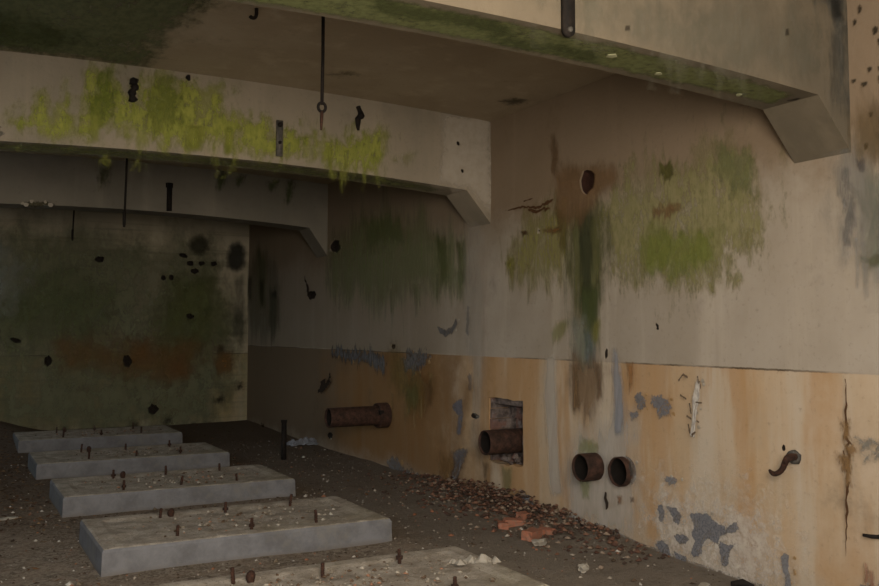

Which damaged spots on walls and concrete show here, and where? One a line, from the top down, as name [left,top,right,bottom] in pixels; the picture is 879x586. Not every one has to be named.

damp [826,0,862,84]
damp [552,139,615,416]
peeling [630,392,675,420]
crack [843,379,852,547]
peeling [644,475,796,586]